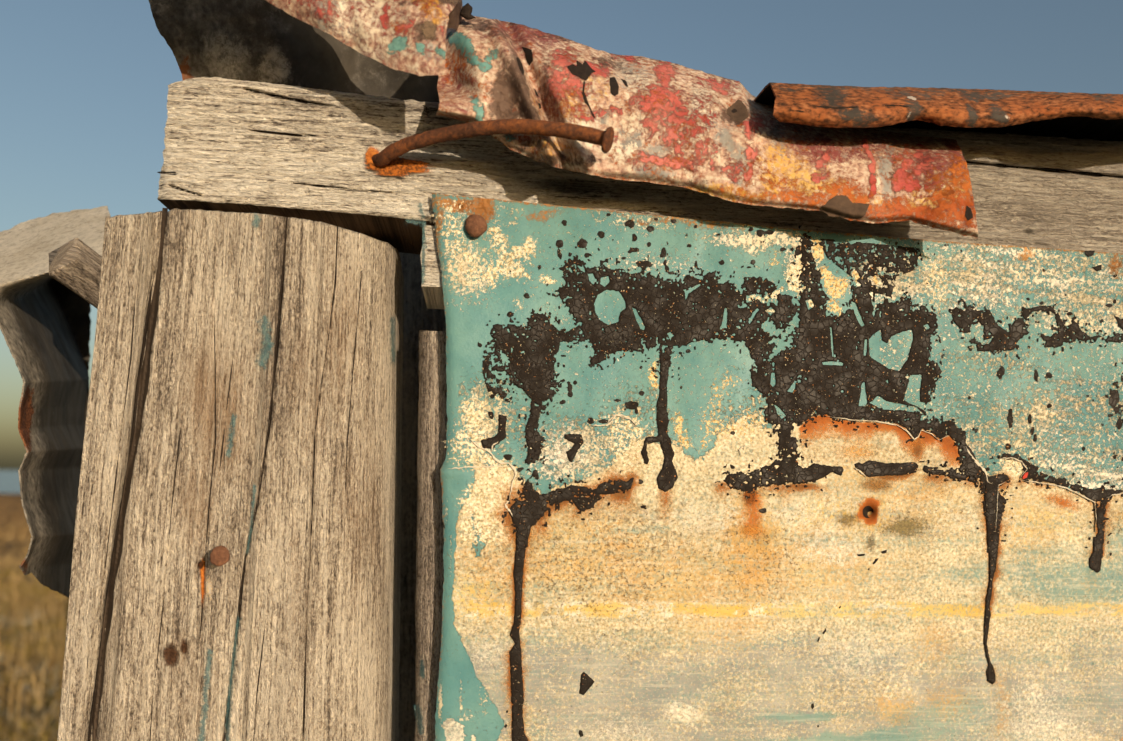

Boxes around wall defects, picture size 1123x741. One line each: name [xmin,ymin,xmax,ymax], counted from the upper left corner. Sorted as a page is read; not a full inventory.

rust [365,147,429,177]
peeling [430,192,557,298]
peeling [746,239,879,318]
rust [198,560,212,598]
crack [223,217,288,741]
crack [308,226,362,598]
peeling [441,393,520,551]
rust [497,472,640,628]
peeling [592,410,656,474]
rust [799,414,1002,614]
peeling [965,446,1122,531]
crack [300,630,308,741]